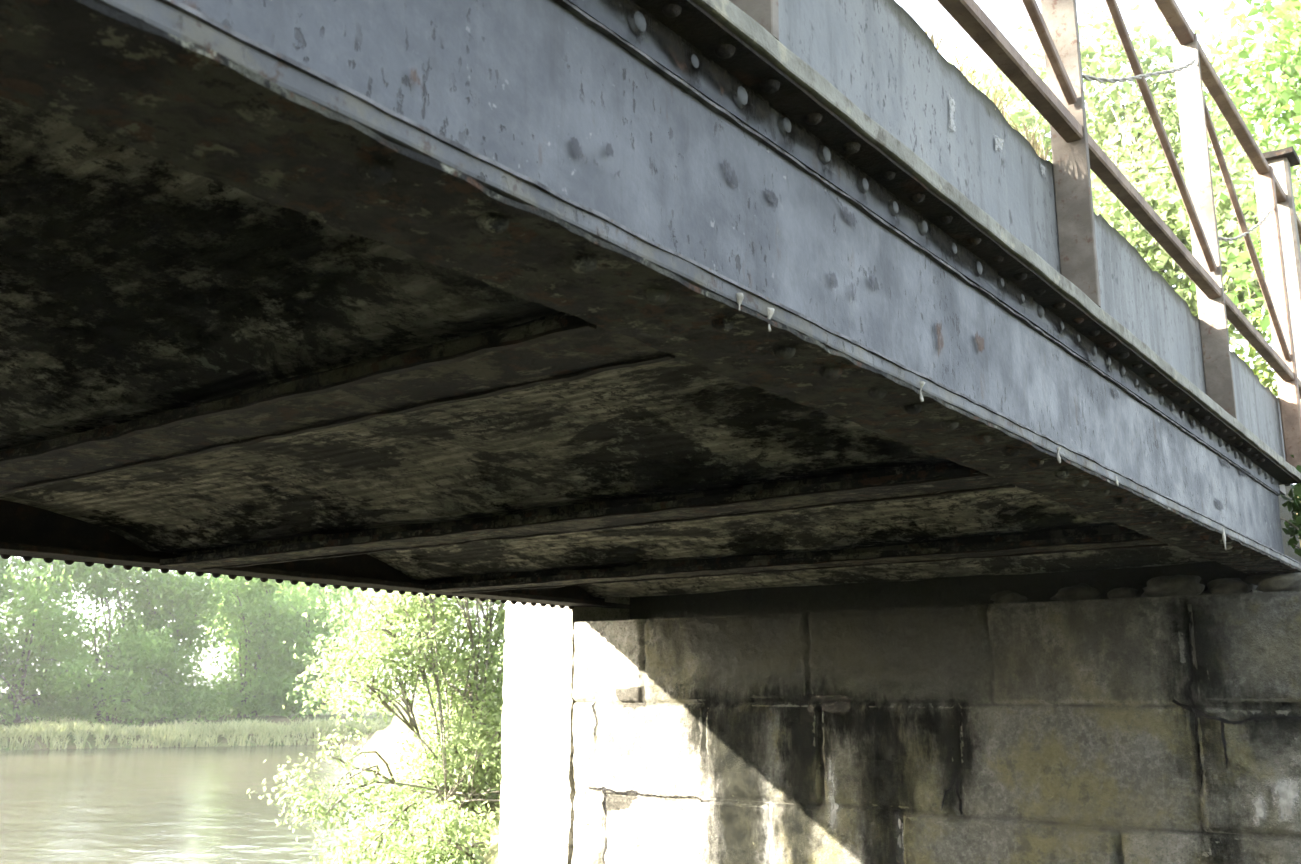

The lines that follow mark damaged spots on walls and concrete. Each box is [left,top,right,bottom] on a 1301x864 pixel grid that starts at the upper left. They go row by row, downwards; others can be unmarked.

damp [0,133,411,432]
damp [465,376,940,515]
damp [561,538,676,570]
damp [718,527,813,558]
damp [837,517,960,549]
damp [989,502,1105,537]
damp [1169,599,1230,787]
damp [1242,697,1301,739]
damp [688,687,973,864]
damp [1252,779,1301,821]
damp [1201,827,1242,864]